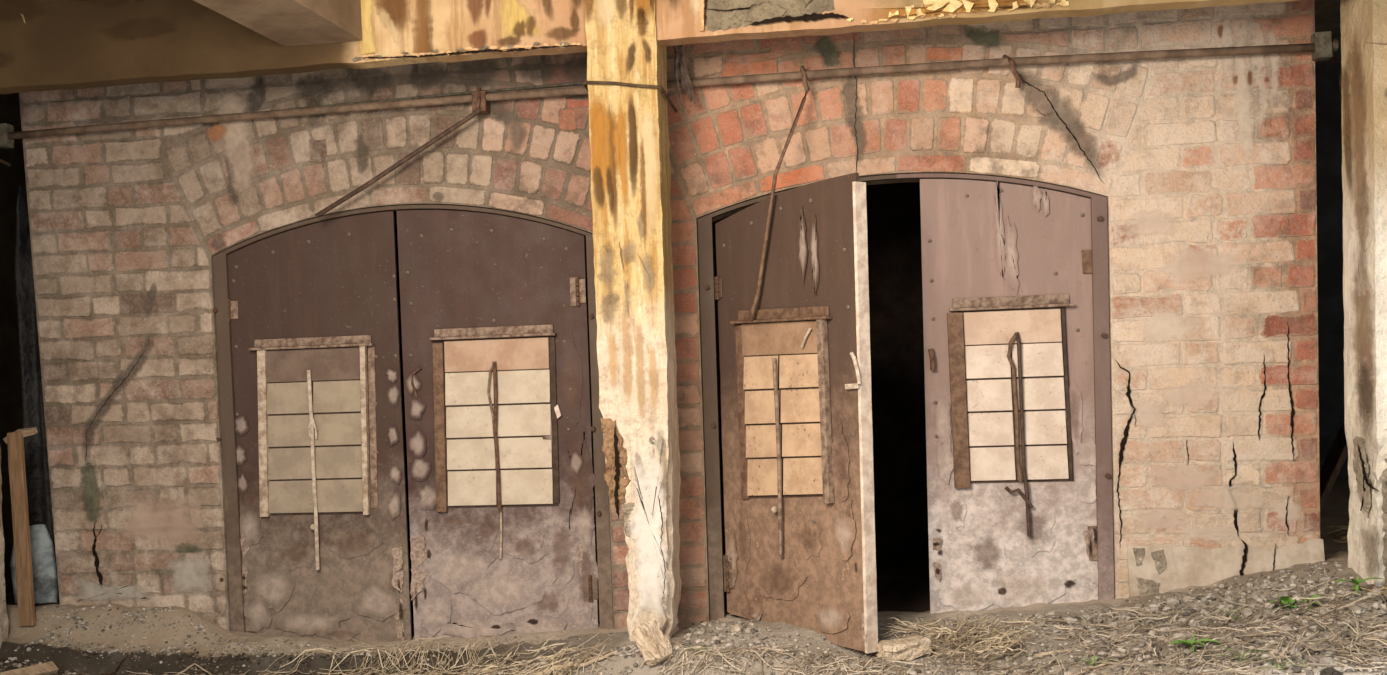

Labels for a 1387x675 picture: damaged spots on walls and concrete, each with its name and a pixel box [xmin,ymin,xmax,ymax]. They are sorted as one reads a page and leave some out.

leakage [499,0,580,45]
leakage [523,58,587,79]
flaking render [699,0,1069,32]
crack [1016,70,1103,182]
crack [1099,67,1136,85]
leakage [1342,48,1373,428]
crack [85,351,145,461]
crack [1115,359,1138,543]
crack [1228,324,1295,575]
crack [92,519,103,586]
peeling [600,418,674,670]
spalling [1353,436,1387,587]